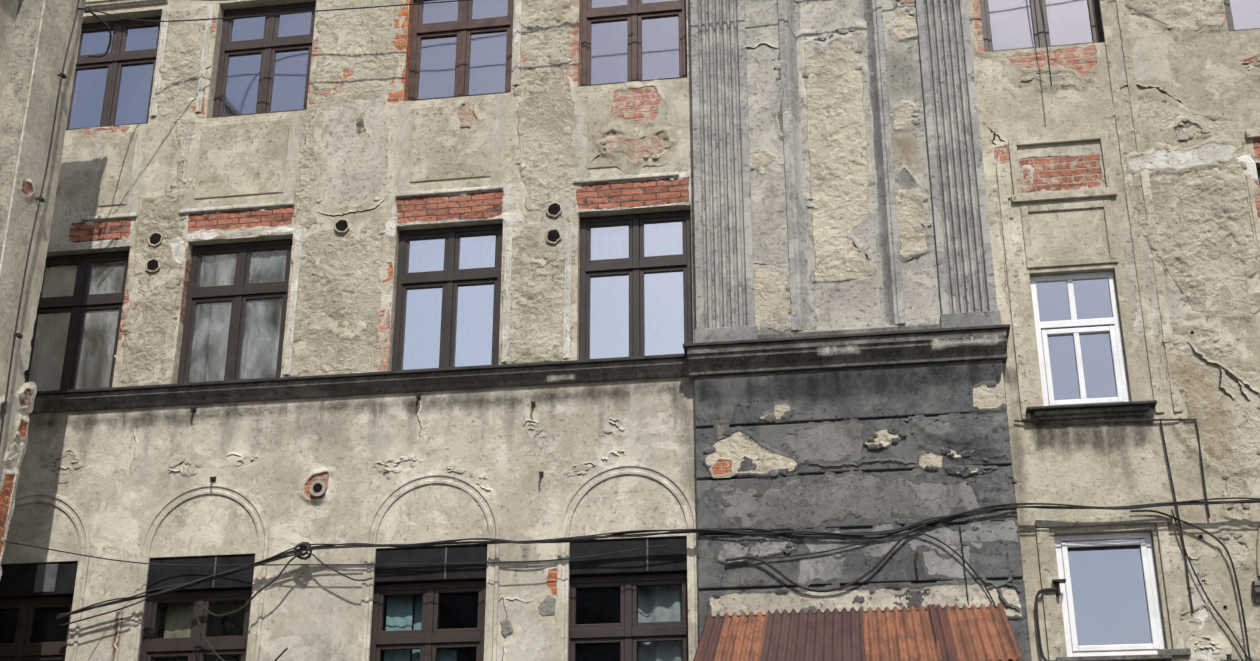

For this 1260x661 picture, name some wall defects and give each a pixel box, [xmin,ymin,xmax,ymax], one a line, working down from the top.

flaking render [967,0,1105,95]
spalling [1110,0,1231,46]
flaking render [1234,51,1260,82]
spalling [63,0,694,387]
spalling [749,19,932,294]
spalling [753,262,792,334]
spalling [986,87,1260,661]
crack [1188,340,1260,400]
flaking render [0,381,86,579]
peeling [700,400,1026,624]
flaking render [540,562,563,602]